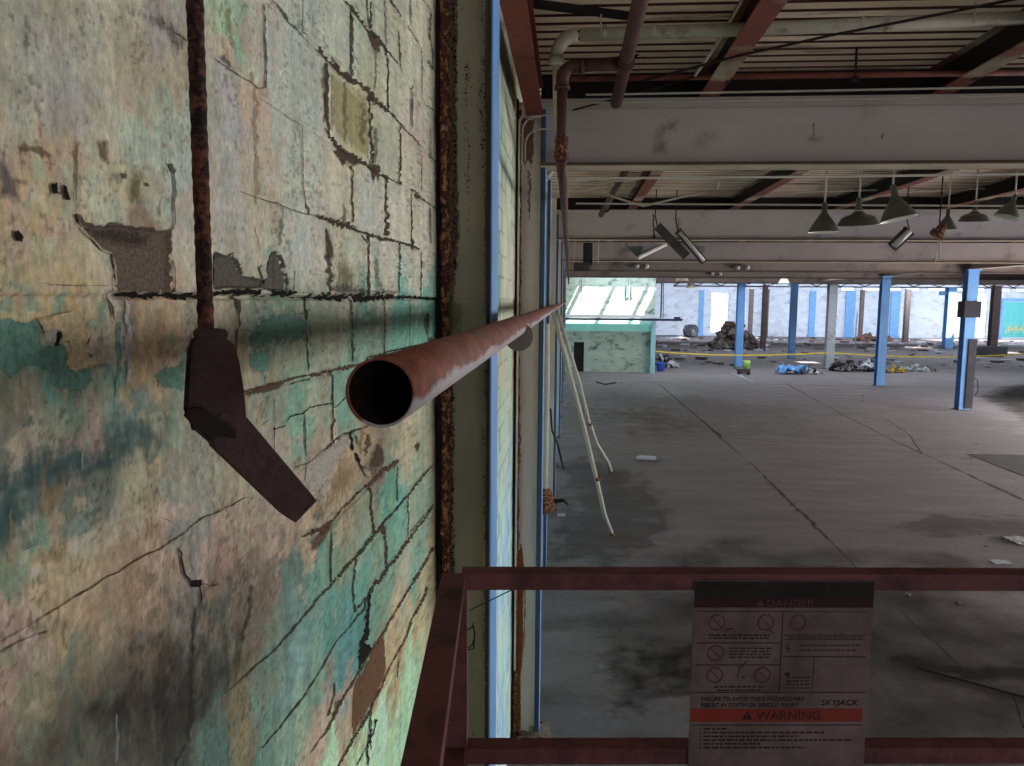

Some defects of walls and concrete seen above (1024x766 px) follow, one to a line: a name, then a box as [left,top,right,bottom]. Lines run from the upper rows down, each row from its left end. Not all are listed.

rust [449,0,487,335]
spalling [74,213,173,293]
spalling [213,251,296,292]
peeling [0,310,99,391]
peeling [155,365,185,391]
crack [106,0,437,766]
peeling [249,310,306,373]
peeling [304,434,351,492]
crack [662,372,856,567]
crack [0,497,248,652]
rust [516,590,526,731]